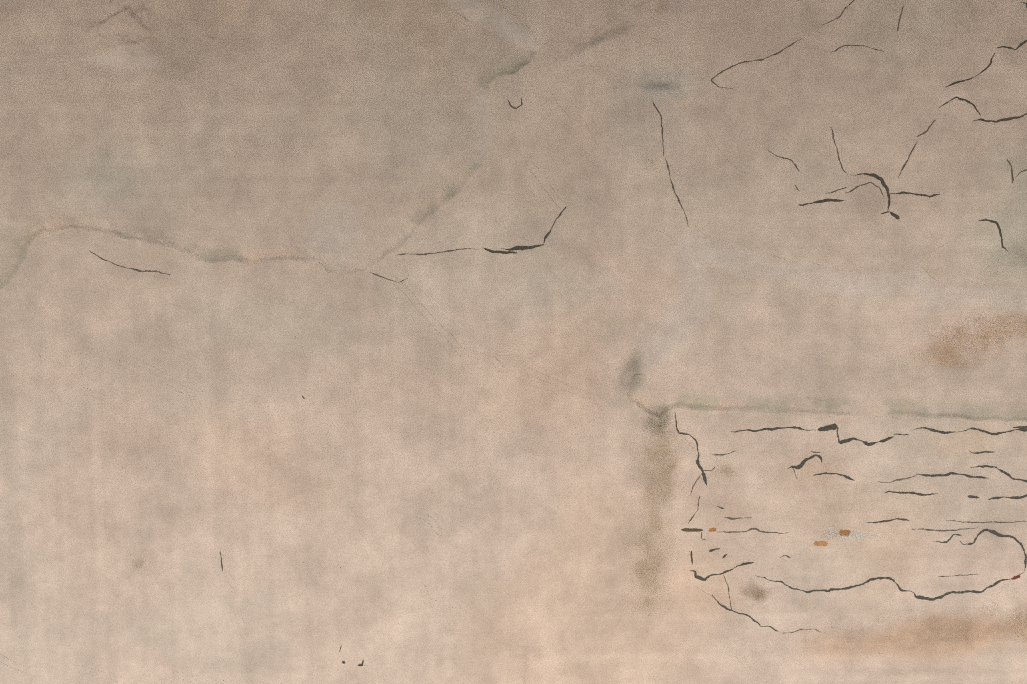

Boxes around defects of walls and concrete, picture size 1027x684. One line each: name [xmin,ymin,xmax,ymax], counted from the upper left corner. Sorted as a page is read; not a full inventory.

crack [711,39,801,89]
crack [832,6,904,52]
spalling [0,0,537,289]
crack [651,99,688,225]
crack [766,40,1027,219]
crack [90,251,170,275]
crack [370,207,566,282]
crack [979,219,1008,251]
spalling [666,411,1027,614]